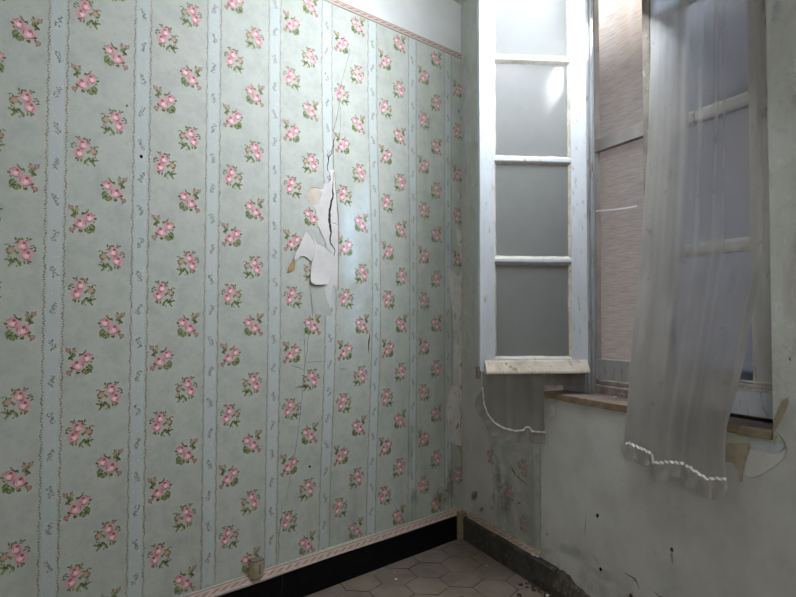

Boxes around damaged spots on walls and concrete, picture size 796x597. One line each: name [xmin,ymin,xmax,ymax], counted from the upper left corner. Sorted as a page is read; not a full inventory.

crack [327,48,350,254]